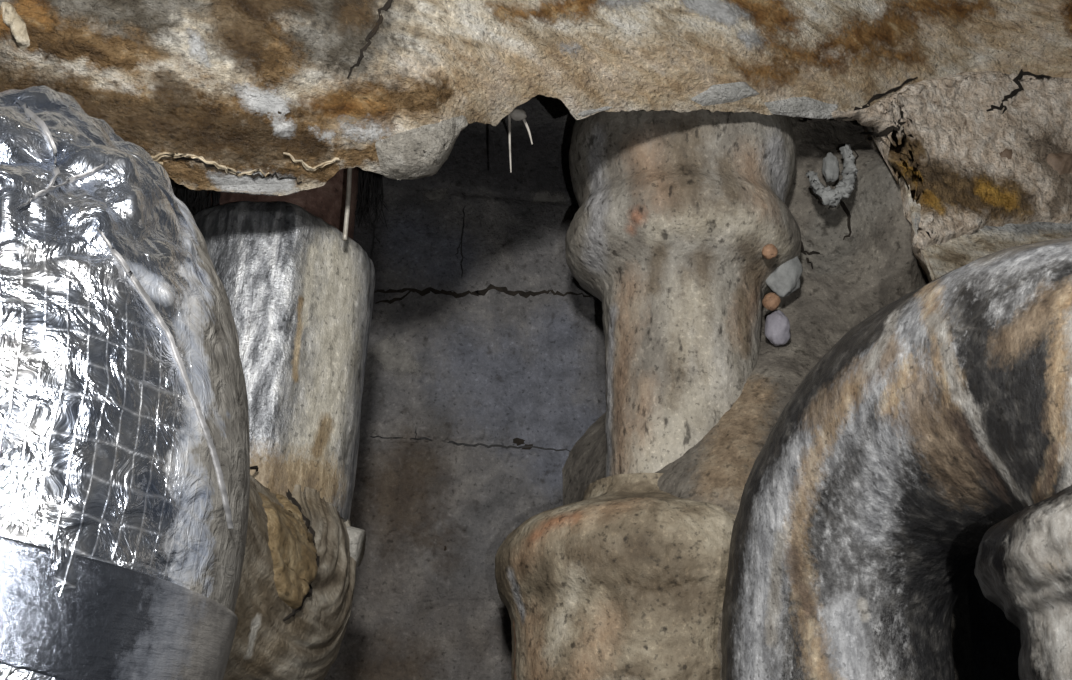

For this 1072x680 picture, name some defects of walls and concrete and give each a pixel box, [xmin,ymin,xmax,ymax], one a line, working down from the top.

corrosion [0,0,60,37]
corrosion [491,0,607,23]
corrosion [1061,0,1072,34]
crack [347,0,393,78]
corrosion [311,90,395,129]
crack [986,69,1055,114]
crack [374,206,590,304]